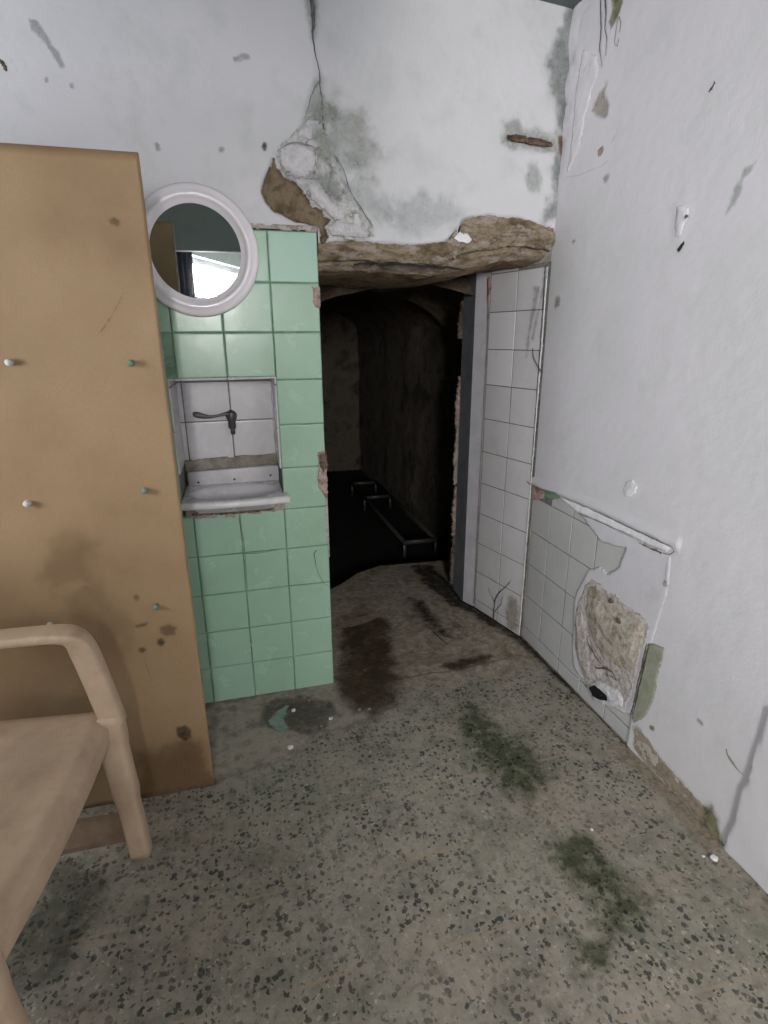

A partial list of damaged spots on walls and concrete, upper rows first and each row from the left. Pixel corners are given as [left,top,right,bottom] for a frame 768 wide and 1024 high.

crack [305,0,334,134]
crack [337,158,374,227]
flaking render [261,111,555,277]
rust [507,134,563,154]
leakage [536,135,561,181]
leakage [548,9,573,130]
peeling [567,0,623,172]
leakage [338,615,399,713]
spalling [561,498,671,715]